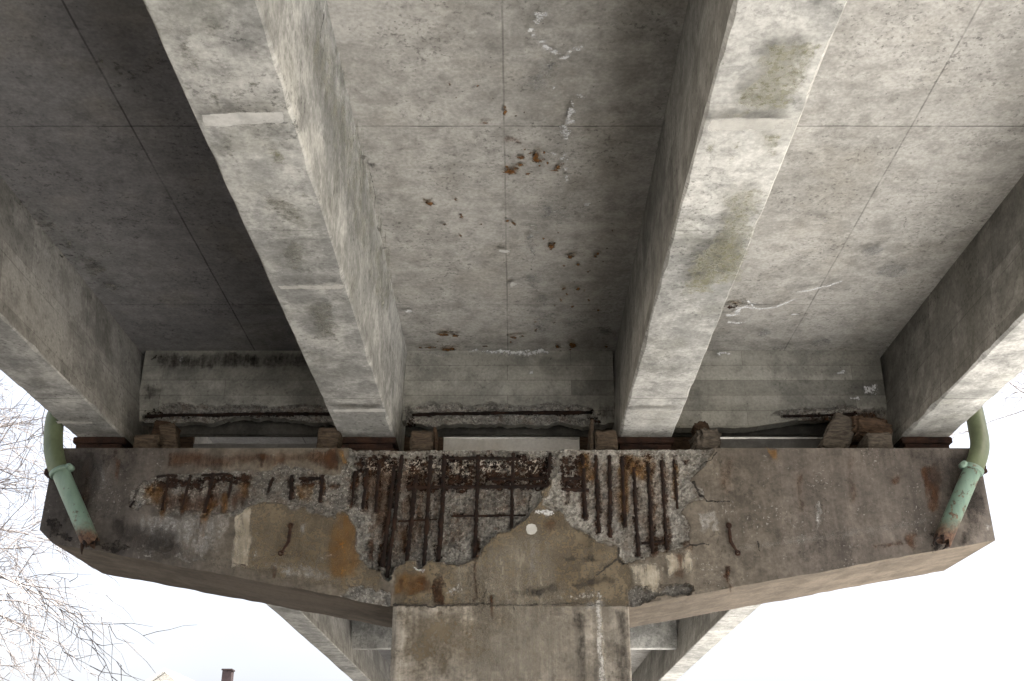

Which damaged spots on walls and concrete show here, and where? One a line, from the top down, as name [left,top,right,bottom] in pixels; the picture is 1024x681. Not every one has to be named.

damp [528,12,583,66]
efflorescence [559,94,583,139]
rust [503,137,564,175]
crack [722,281,842,329]
spalling [142,402,333,424]
spalling [403,402,601,427]
crack [692,452,730,503]
spalling [129,448,714,607]